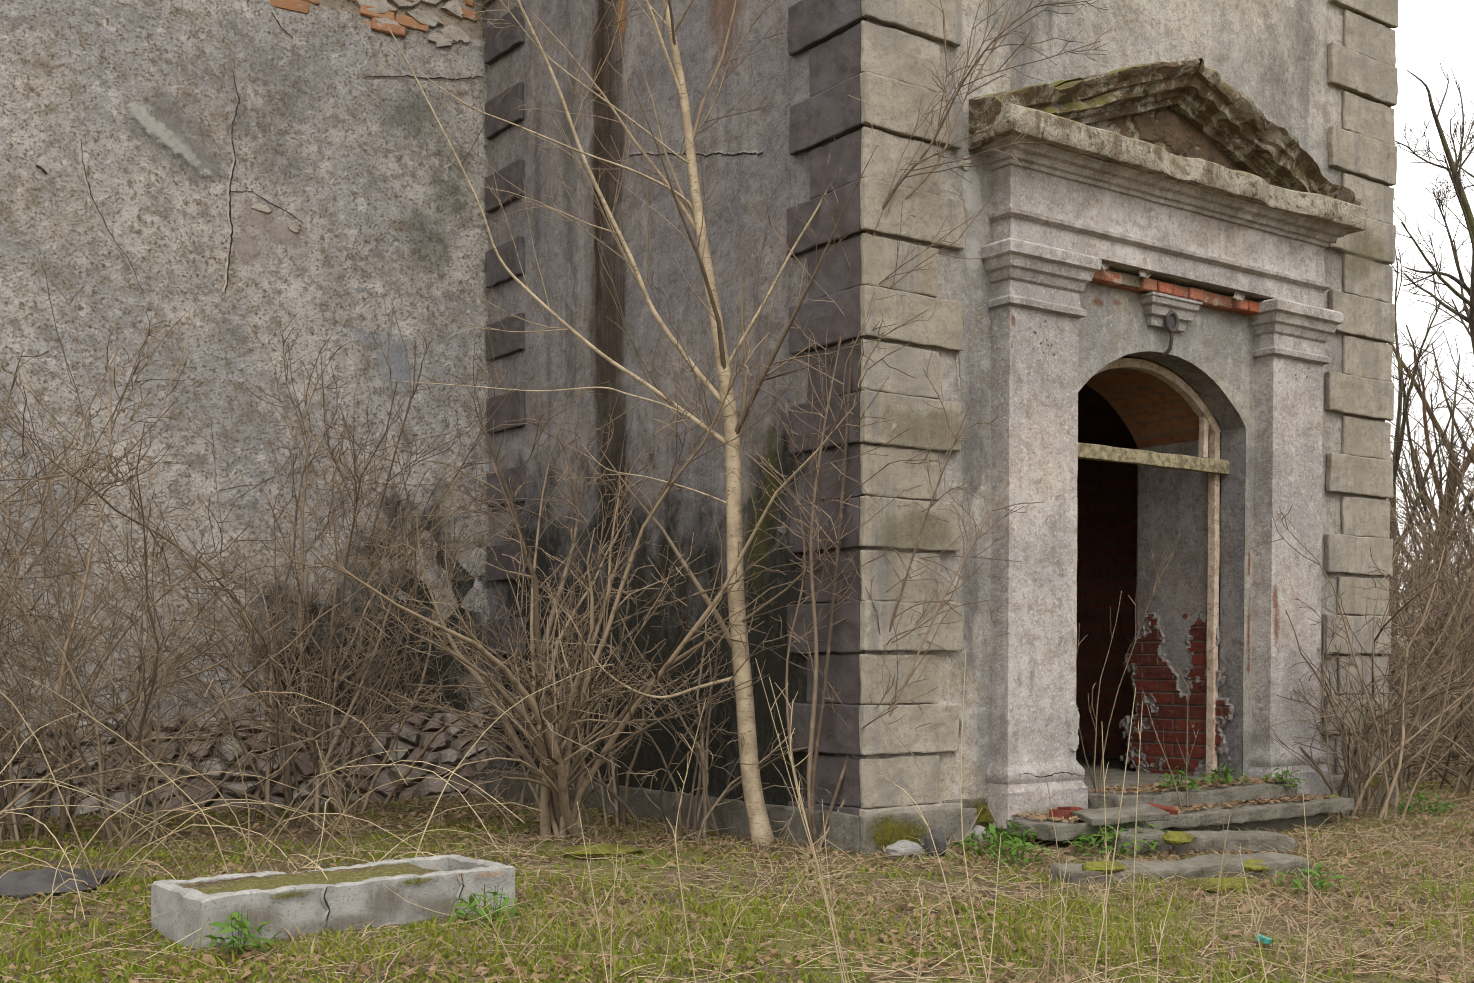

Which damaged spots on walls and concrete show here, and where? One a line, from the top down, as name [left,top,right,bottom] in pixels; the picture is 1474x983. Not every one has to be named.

spalling [250,0,483,48]
spalling [1131,107,1246,172]
spalling [1119,611,1234,776]